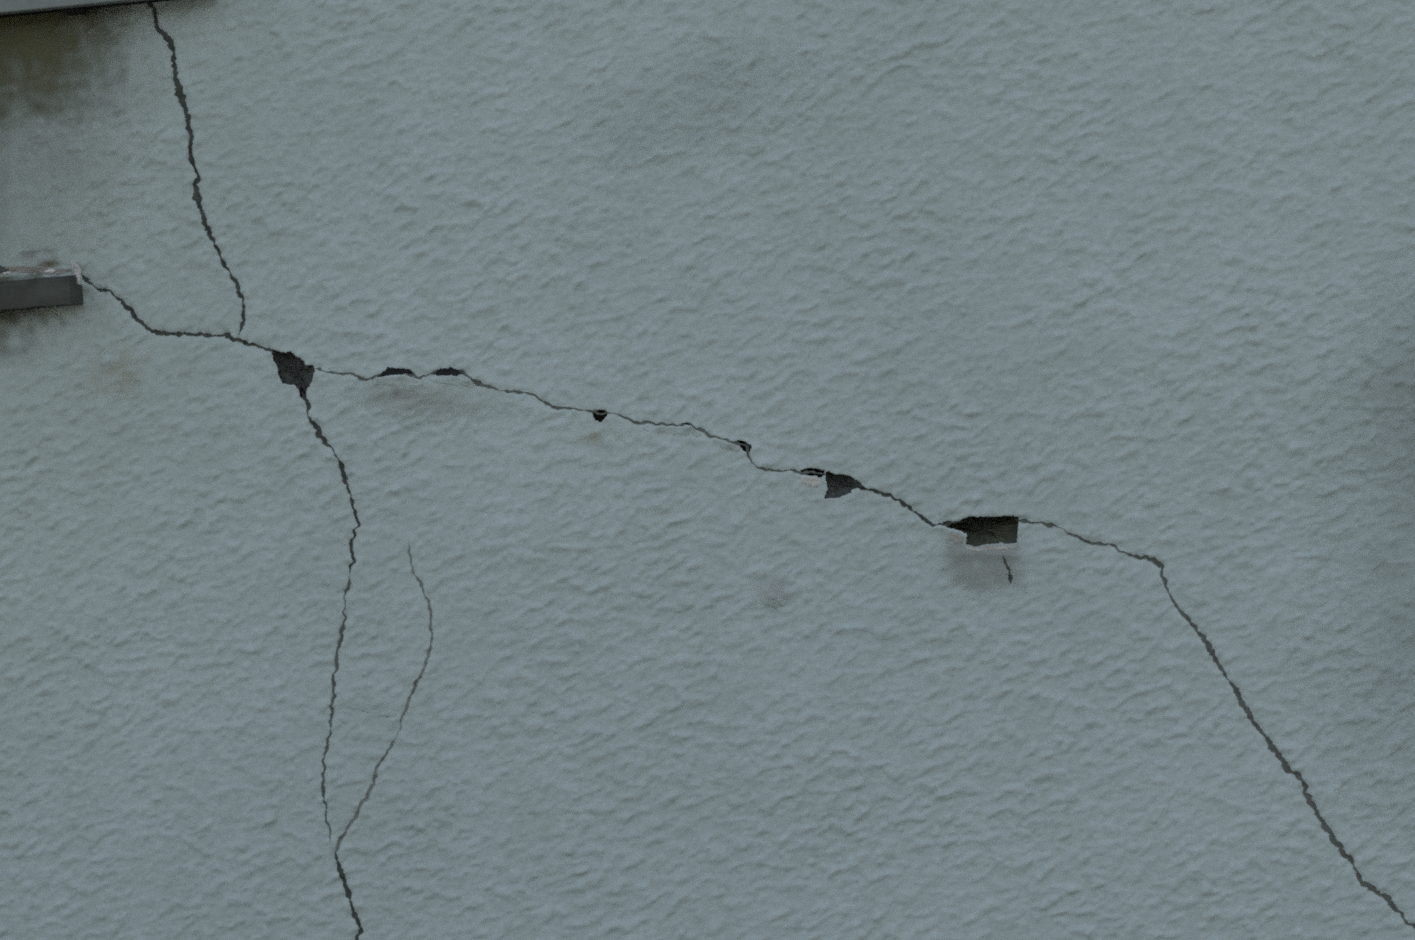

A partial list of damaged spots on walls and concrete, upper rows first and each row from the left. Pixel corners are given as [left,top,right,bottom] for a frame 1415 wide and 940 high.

crack [81,3,276,354]
spalling [272,349,315,396]
crack [301,367,964,940]
spalling [801,468,861,498]
spalling [945,516,1019,585]
crack [1015,519,1415,929]